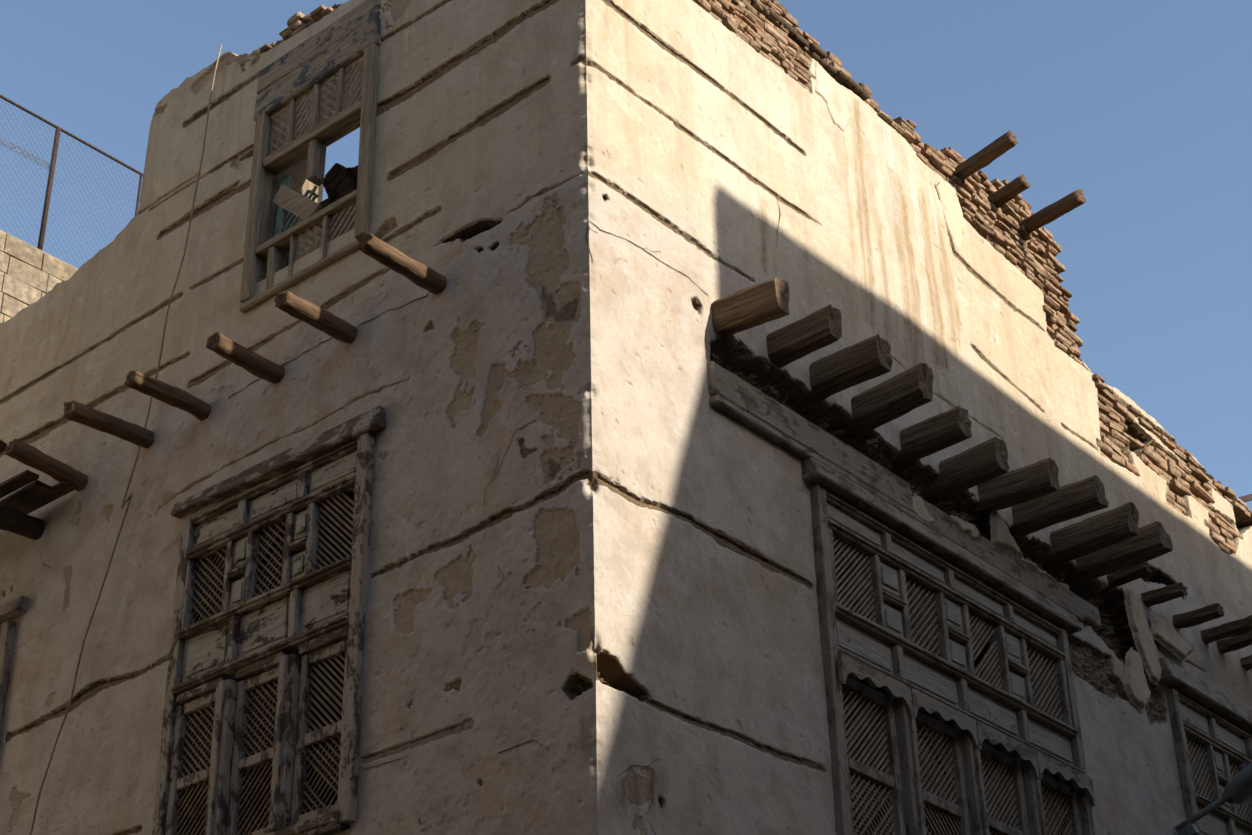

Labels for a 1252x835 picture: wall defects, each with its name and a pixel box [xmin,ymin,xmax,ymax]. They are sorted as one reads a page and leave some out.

peeling [446,194,584,487]
peeling [394,546,477,634]
peeling [524,508,581,589]
peeling [558,608,594,653]
spalling [710,337,1192,725]
spalling [563,673,594,701]